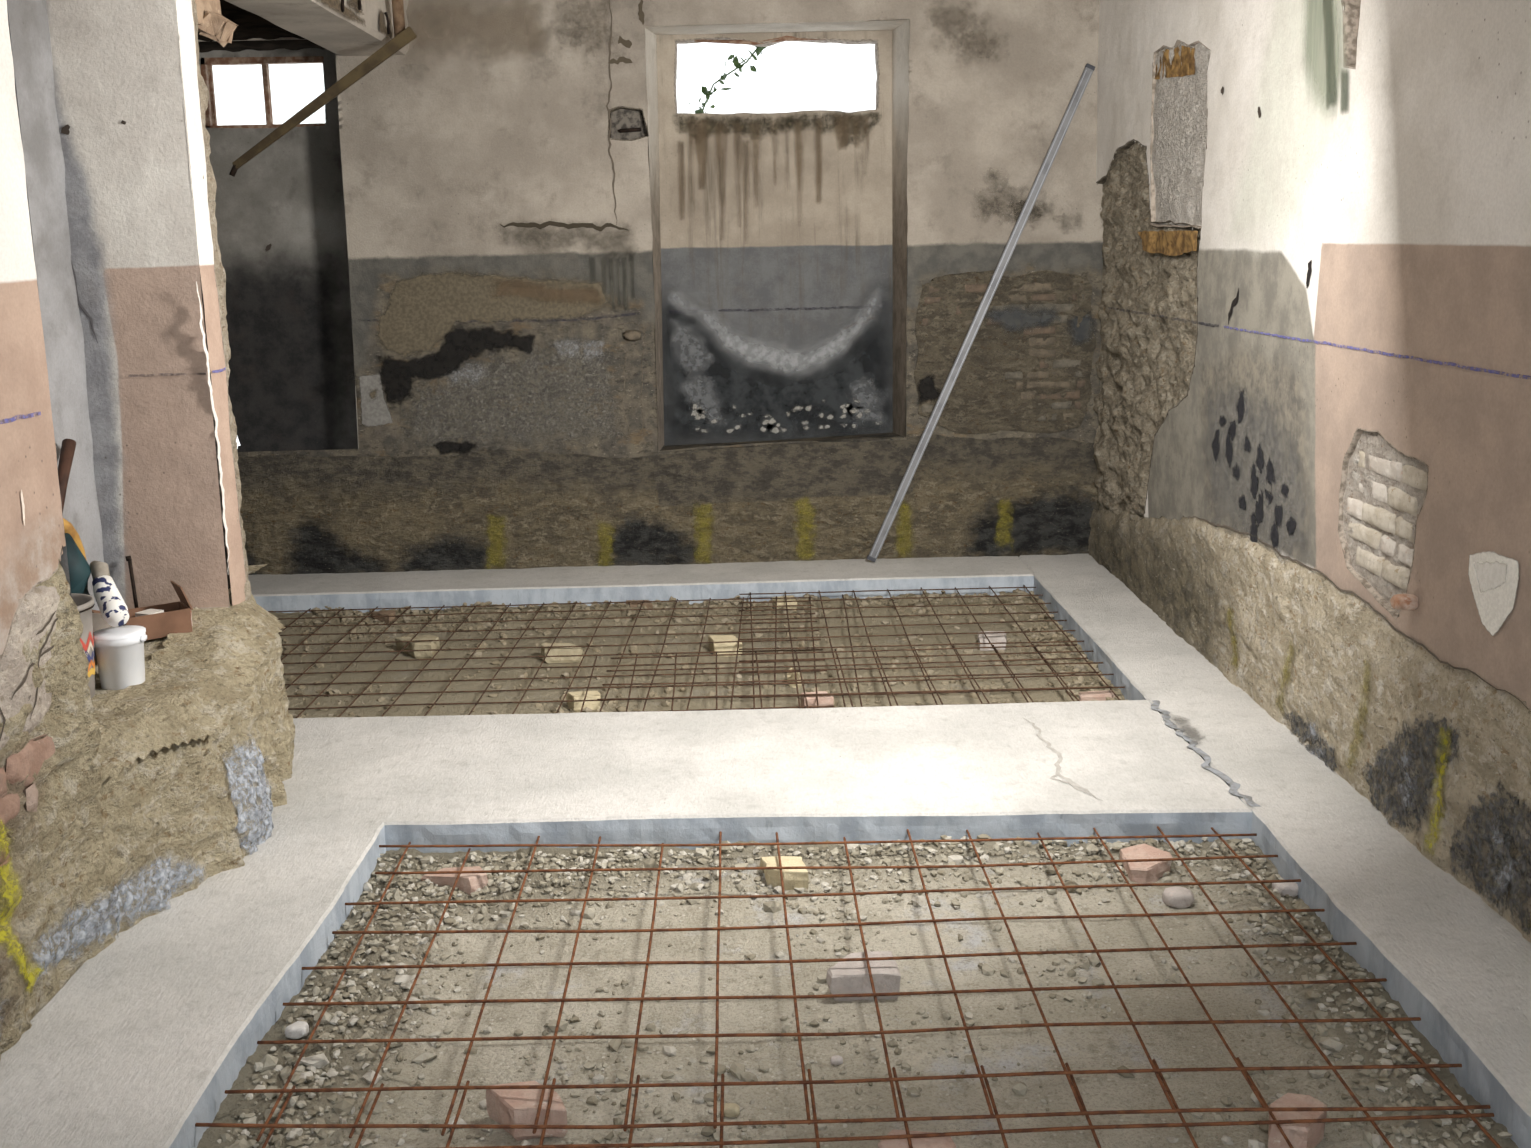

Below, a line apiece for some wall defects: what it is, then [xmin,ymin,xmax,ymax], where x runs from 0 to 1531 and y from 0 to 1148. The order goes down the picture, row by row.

water stain [679,113,879,204]
flaking render [377,272,607,356]
flaking render [1338,427,1429,620]
flaking render [0,545,63,866]
crack [1022,717,1104,801]